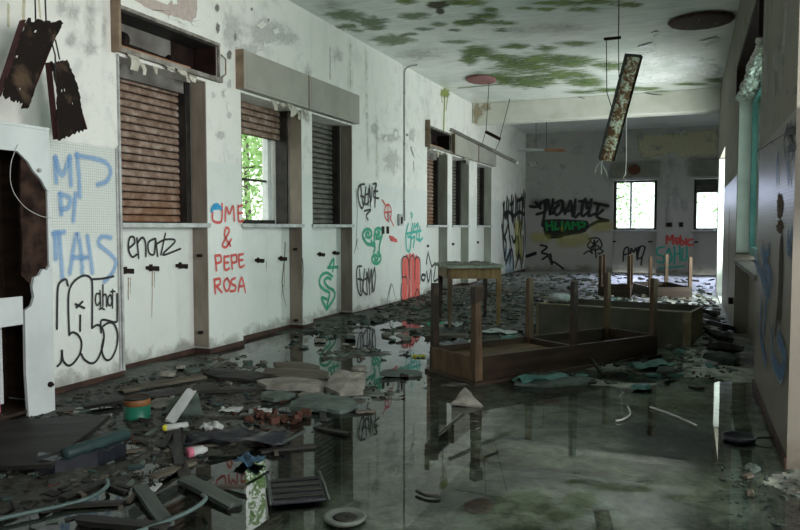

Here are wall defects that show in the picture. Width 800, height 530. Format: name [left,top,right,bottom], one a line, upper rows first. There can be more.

spalling [135,0,204,27]
leakage [516,0,641,12]
leakage [324,0,622,94]
spalling [735,37,763,102]